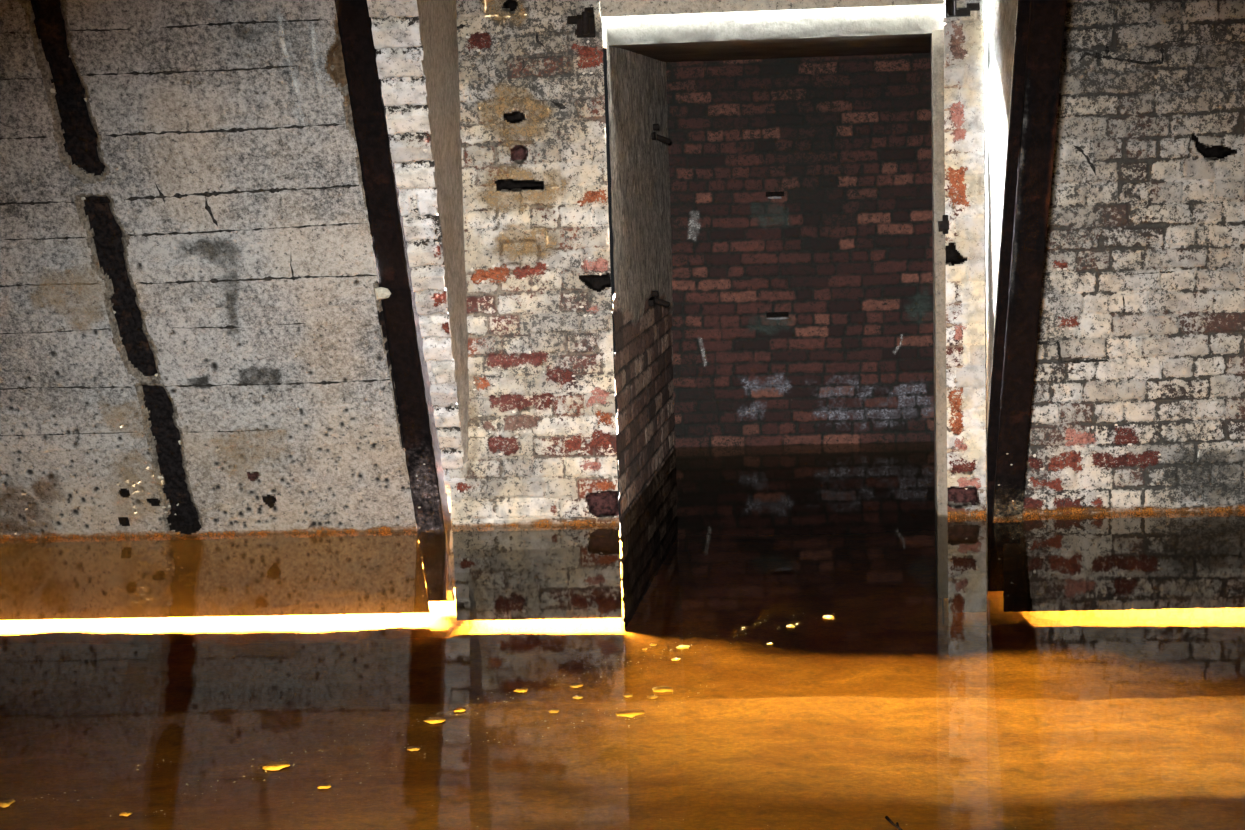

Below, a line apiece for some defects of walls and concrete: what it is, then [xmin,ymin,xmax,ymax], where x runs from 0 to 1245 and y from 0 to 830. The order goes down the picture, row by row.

crack [166,19,331,28]
crack [86,65,298,76]
spalling [1190,133,1237,161]
peeling [577,189,608,207]
peeling [469,259,550,284]
crack [175,323,240,331]
crack [0,383,131,391]
crack [165,379,390,387]
peeling [473,350,576,456]
crack [0,430,139,438]
spalling [562,386,619,518]
peeling [1007,424,1161,520]